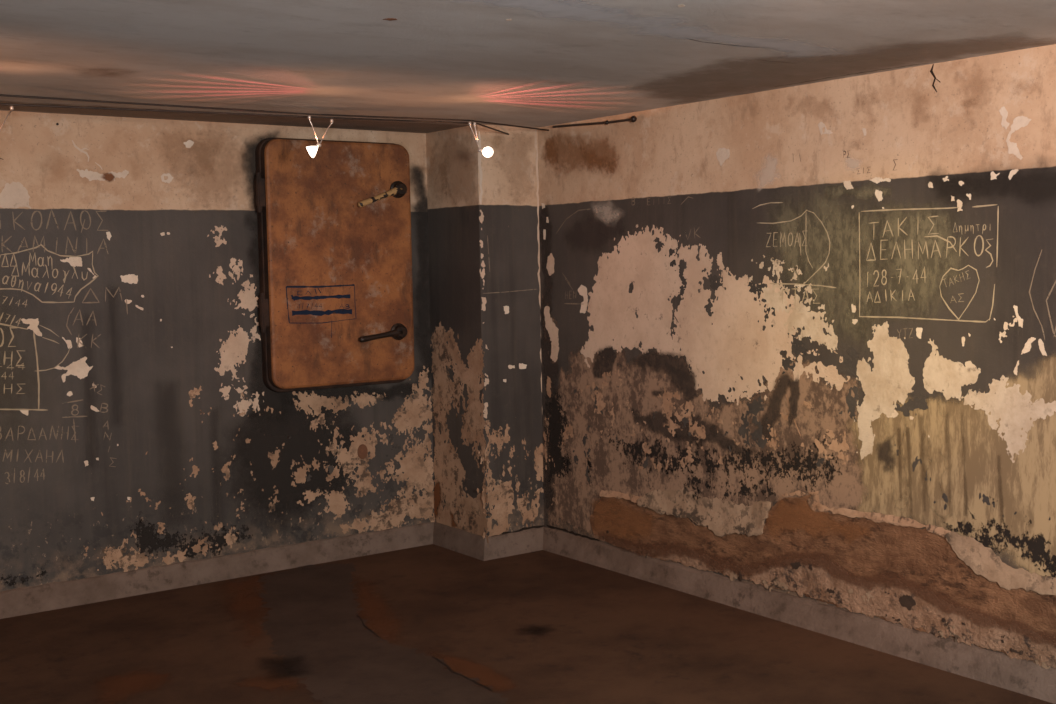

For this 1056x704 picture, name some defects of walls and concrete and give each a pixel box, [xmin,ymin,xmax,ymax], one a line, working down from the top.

crack [681,37,940,92]
leakage [546,138,615,170]
peeling [120,274,144,310]
peeling [207,225,227,247]
peeling [84,455,246,572]
peeling [189,386,212,423]
peeling [209,258,281,443]
peeling [250,210,1056,669]
leakage [609,352,1056,578]
leakage [599,533,1056,647]